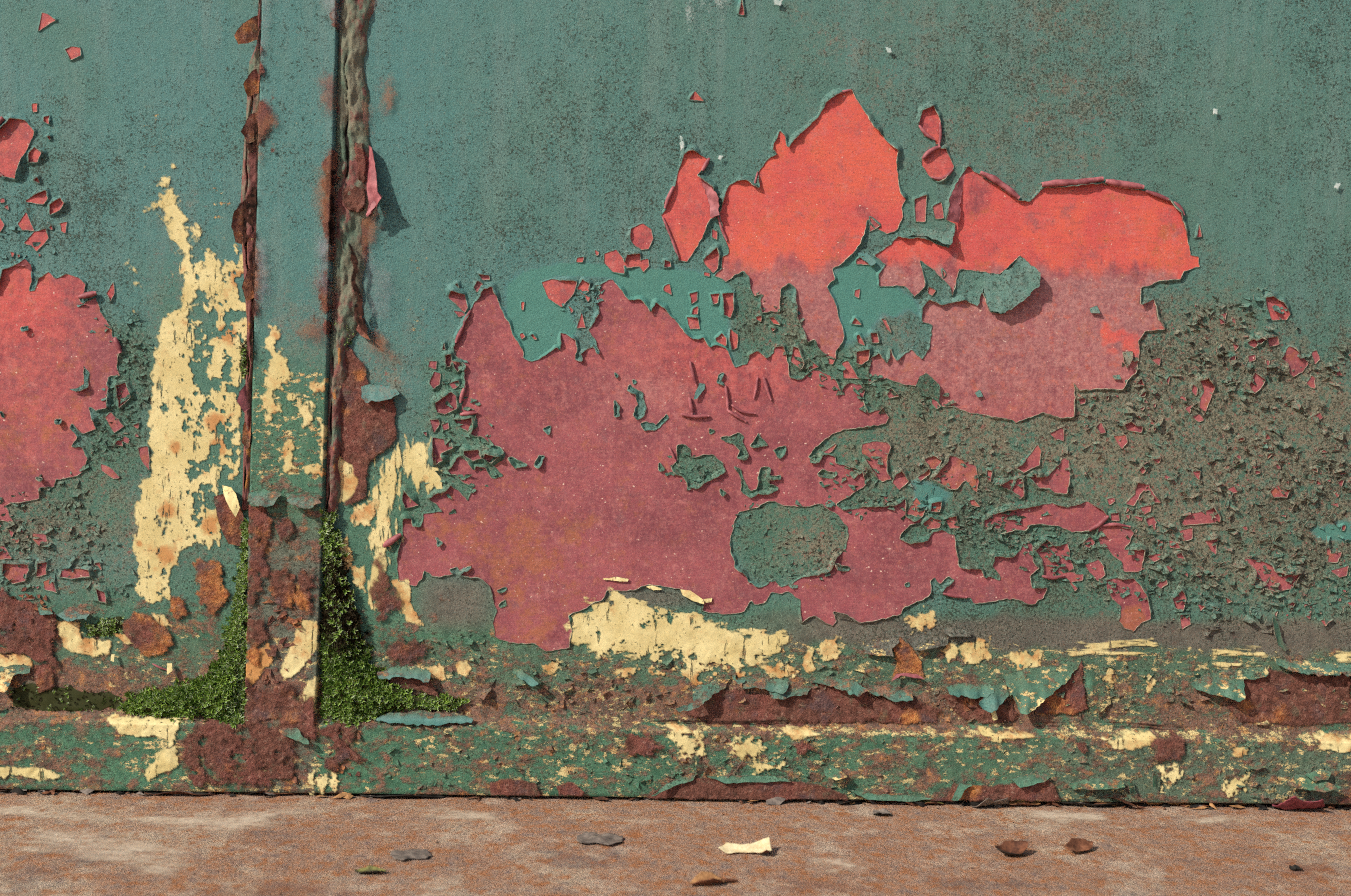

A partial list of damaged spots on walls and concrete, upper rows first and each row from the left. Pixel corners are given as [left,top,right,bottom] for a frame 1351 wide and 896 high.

corrosion [304,143,382,336]
peeling [0,102,247,627]
peeling [260,88,1351,718]
corrosion [0,587,58,693]
peeling [55,620,131,657]
corrosion [123,557,229,656]
corrosion [180,488,368,795]
peeling [246,620,321,710]
corrosion [676,627,1111,728]
corrosion [1191,617,1351,726]
peeling [107,713,182,781]
peeling [491,720,847,789]